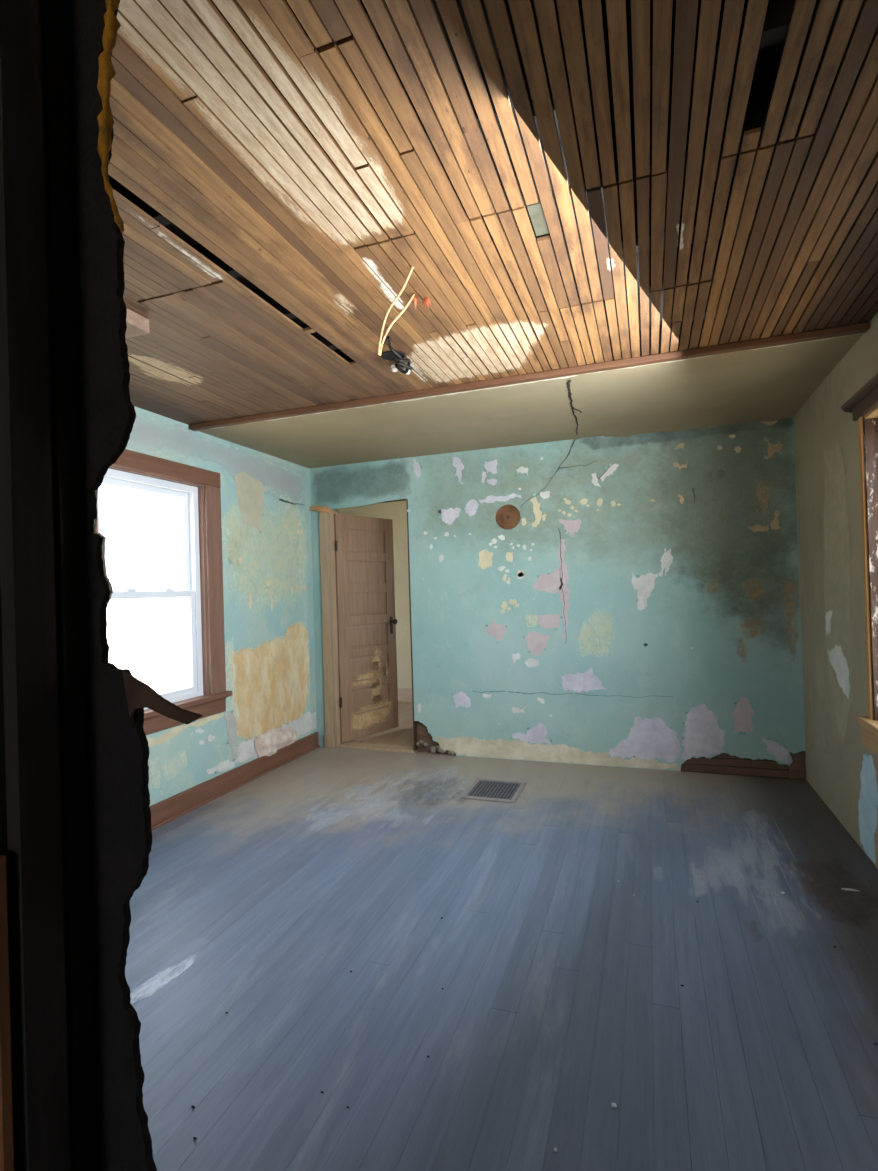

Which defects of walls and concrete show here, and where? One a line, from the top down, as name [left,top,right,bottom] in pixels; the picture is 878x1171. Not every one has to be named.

damp [117,0,402,245]
crack [521,380,619,506]
peeling [235,471,266,532]
peeling [423,455,621,668]
peeling [630,549,673,611]
damp [662,431,788,637]
peeling [451,690,517,708]
peeling [561,668,606,694]
flaking render [416,696,805,780]
peeling [826,610,850,699]